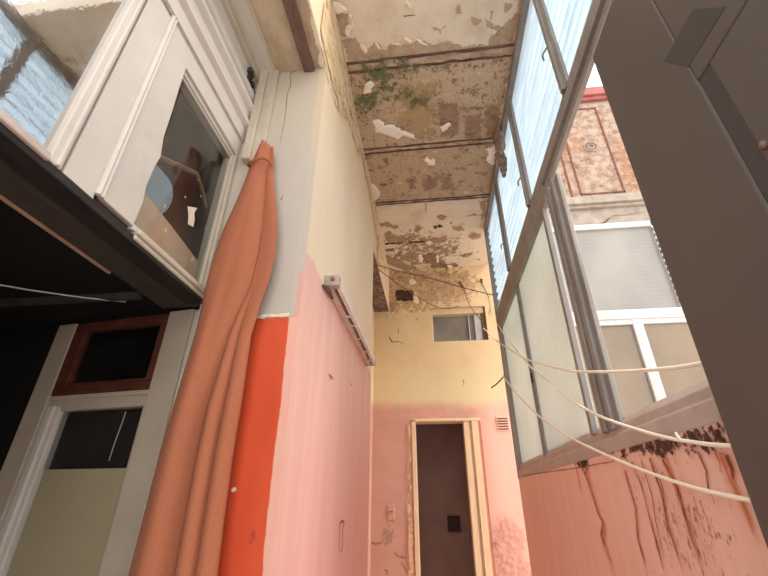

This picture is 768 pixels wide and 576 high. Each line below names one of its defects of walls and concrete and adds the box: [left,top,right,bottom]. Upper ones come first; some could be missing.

peeling [307,0,521,270]
spalling [395,289,413,302]
rust [608,422,752,575]